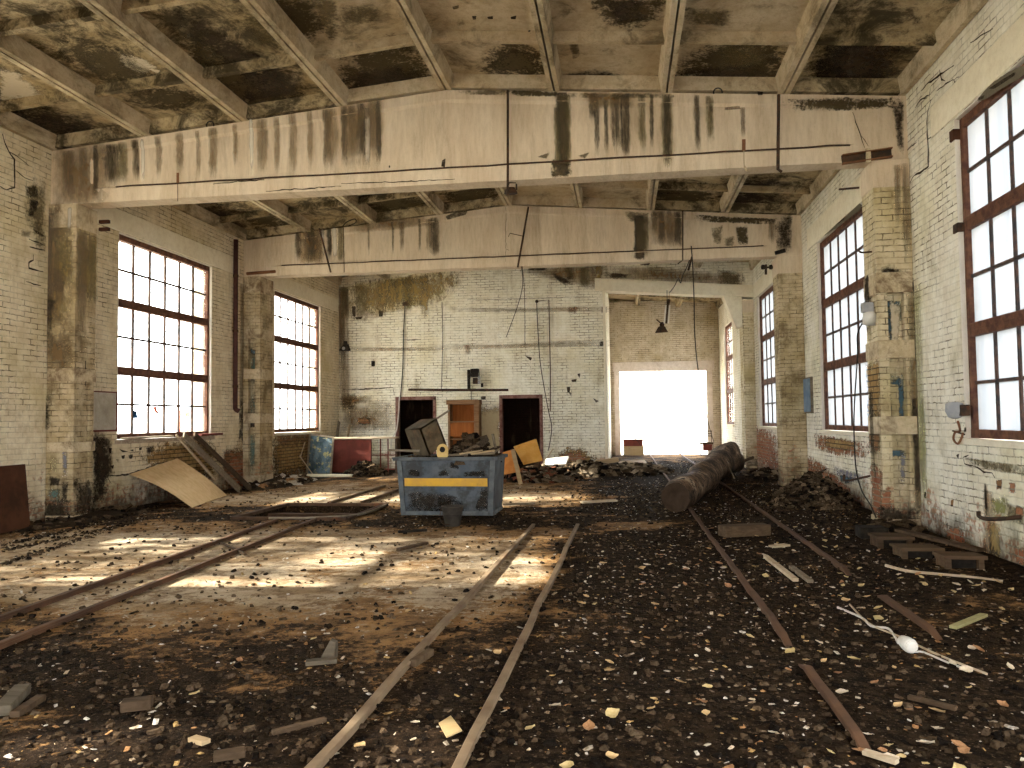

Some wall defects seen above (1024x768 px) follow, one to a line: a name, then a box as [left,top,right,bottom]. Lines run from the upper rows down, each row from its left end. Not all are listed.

damp [338,33,430,89]
damp [675,45,787,77]
crack [0,134,33,190]
damp [249,101,381,164]
damp [468,91,674,177]
damp [788,97,904,148]
crack [907,65,957,182]
damp [23,137,161,368]
damp [529,178,744,286]
damp [697,215,792,249]
peeling [866,360,904,417]
peeling [808,433,929,519]